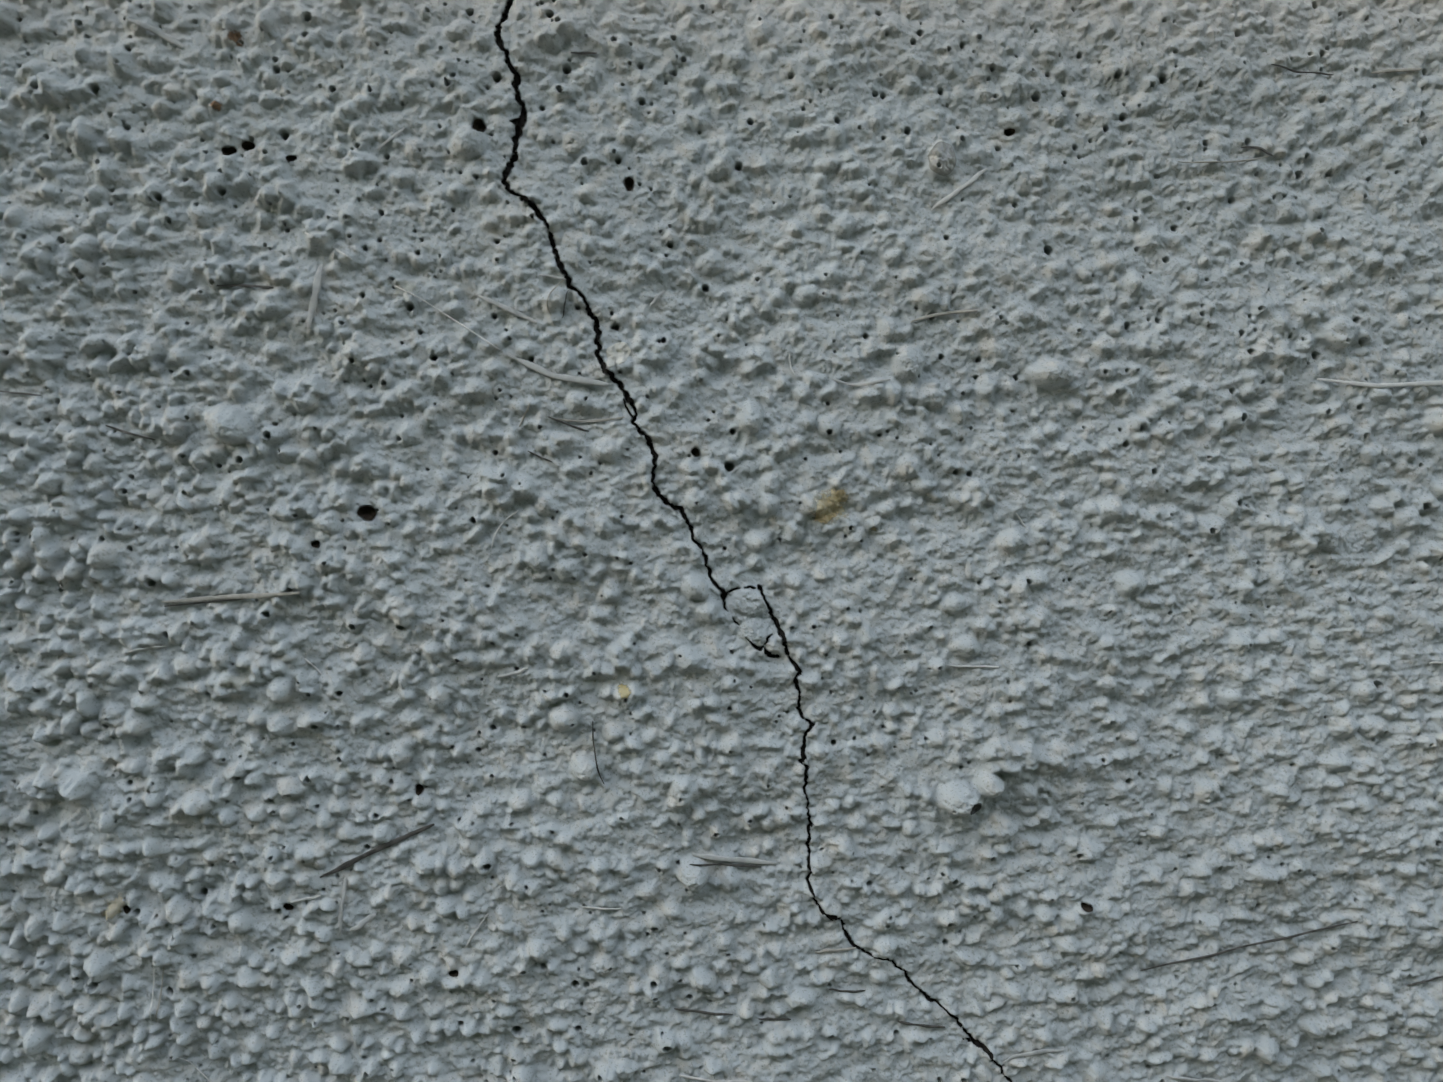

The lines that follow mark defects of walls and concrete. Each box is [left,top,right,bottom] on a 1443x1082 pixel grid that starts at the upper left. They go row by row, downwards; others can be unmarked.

crack [494,0,1012,1082]